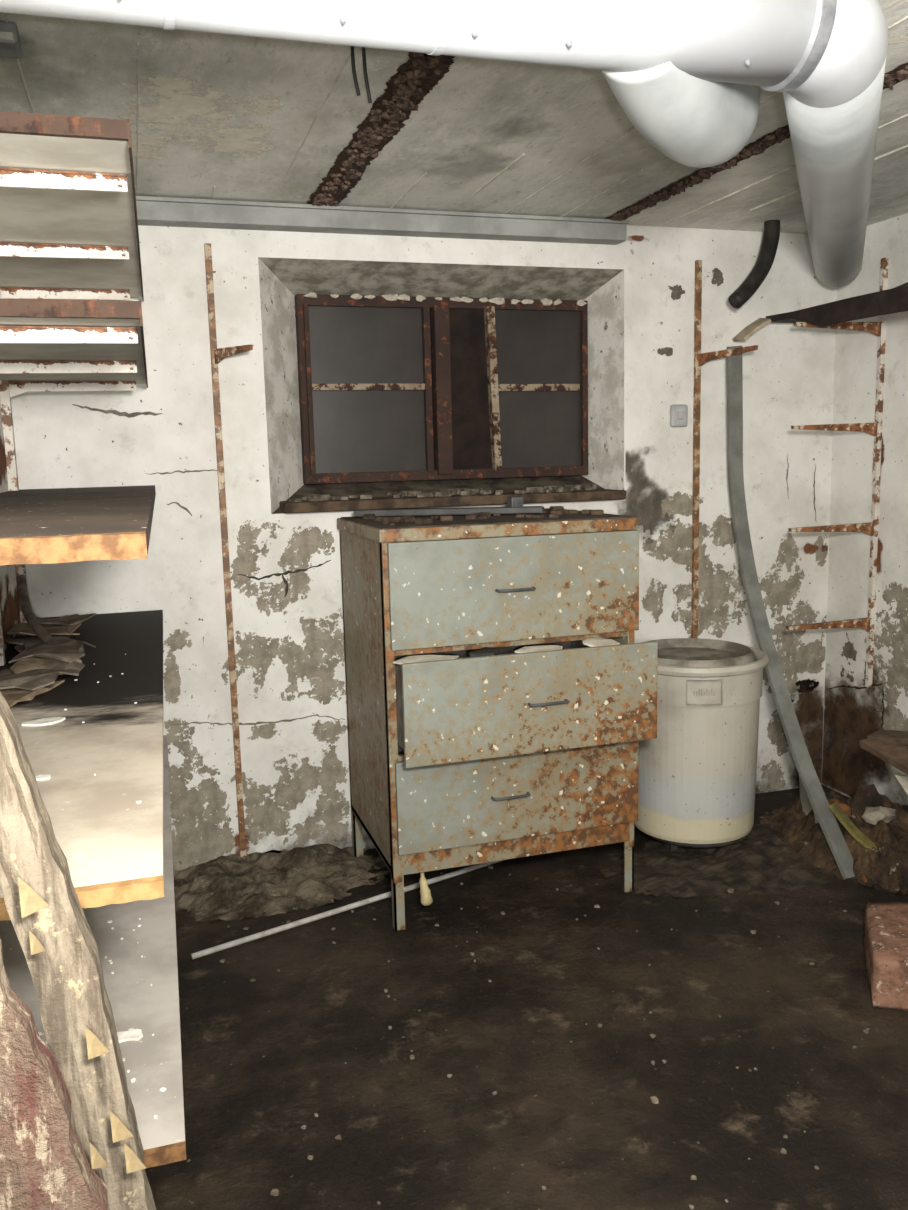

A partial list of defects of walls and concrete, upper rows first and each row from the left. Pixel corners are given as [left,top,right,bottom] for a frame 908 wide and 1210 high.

crack [72,404,163,418]
peeling [220,520,346,705]
crack [237,560,331,597]
peeling [642,488,748,638]
peeling [758,532,828,702]
rust [804,543,828,554]
peeling [840,582,908,747]
peeling [163,629,351,870]
peeling [758,709,788,791]